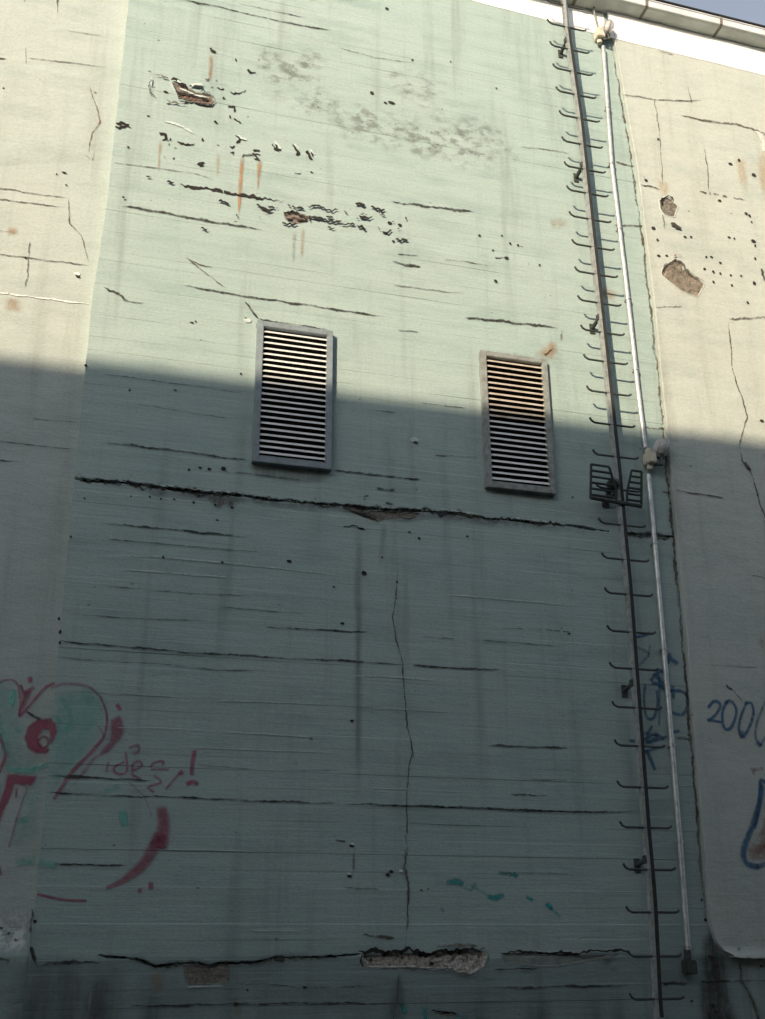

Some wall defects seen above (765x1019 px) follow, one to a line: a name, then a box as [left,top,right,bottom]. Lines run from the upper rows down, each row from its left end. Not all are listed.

crack [0,47,101,160]
spalling [148,70,246,123]
rust [238,154,261,208]
peeling [272,140,315,174]
spalling [256,202,408,242]
spalling [651,195,692,241]
spalling [657,254,742,298]
crack [728,326,765,515]
crack [78,443,589,530]
crack [51,573,630,939]
crack [29,909,399,1019]
spalling [359,943,628,976]